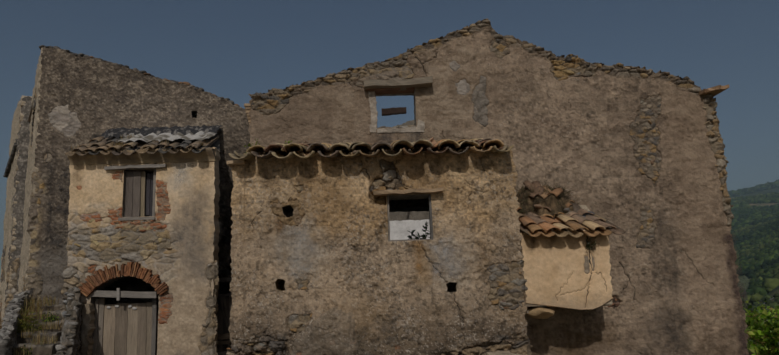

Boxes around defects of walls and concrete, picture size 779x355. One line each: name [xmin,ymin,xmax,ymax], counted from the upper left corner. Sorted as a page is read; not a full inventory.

spalling [370,159,405,205]
spalling [59,180,173,331]
crack [418,241,466,325]
crack [557,238,635,306]